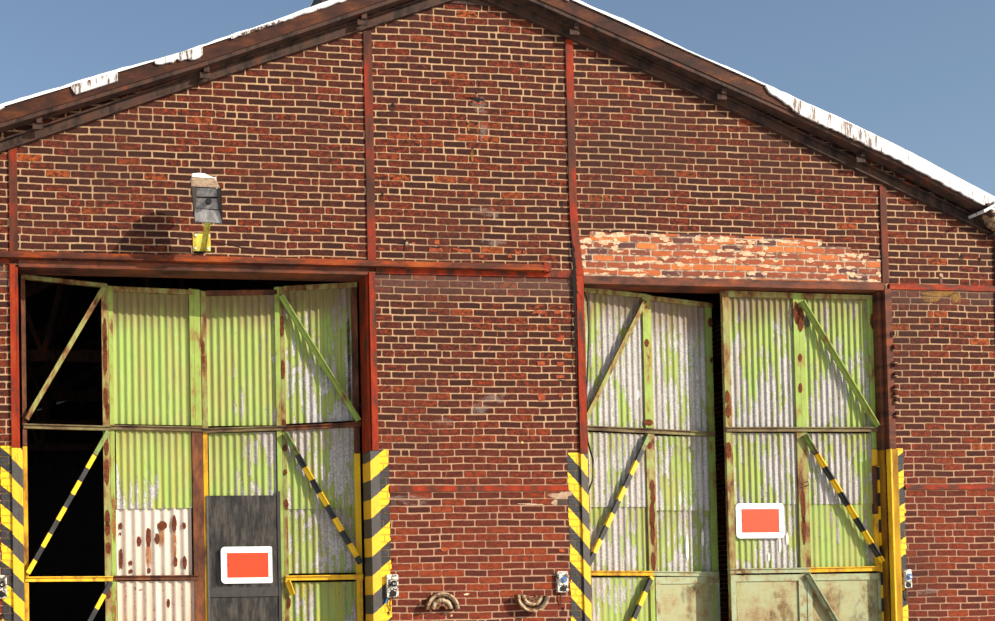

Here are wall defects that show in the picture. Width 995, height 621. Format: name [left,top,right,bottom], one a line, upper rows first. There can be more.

peeling [580,232,881,282]
rust [793,301,804,332]